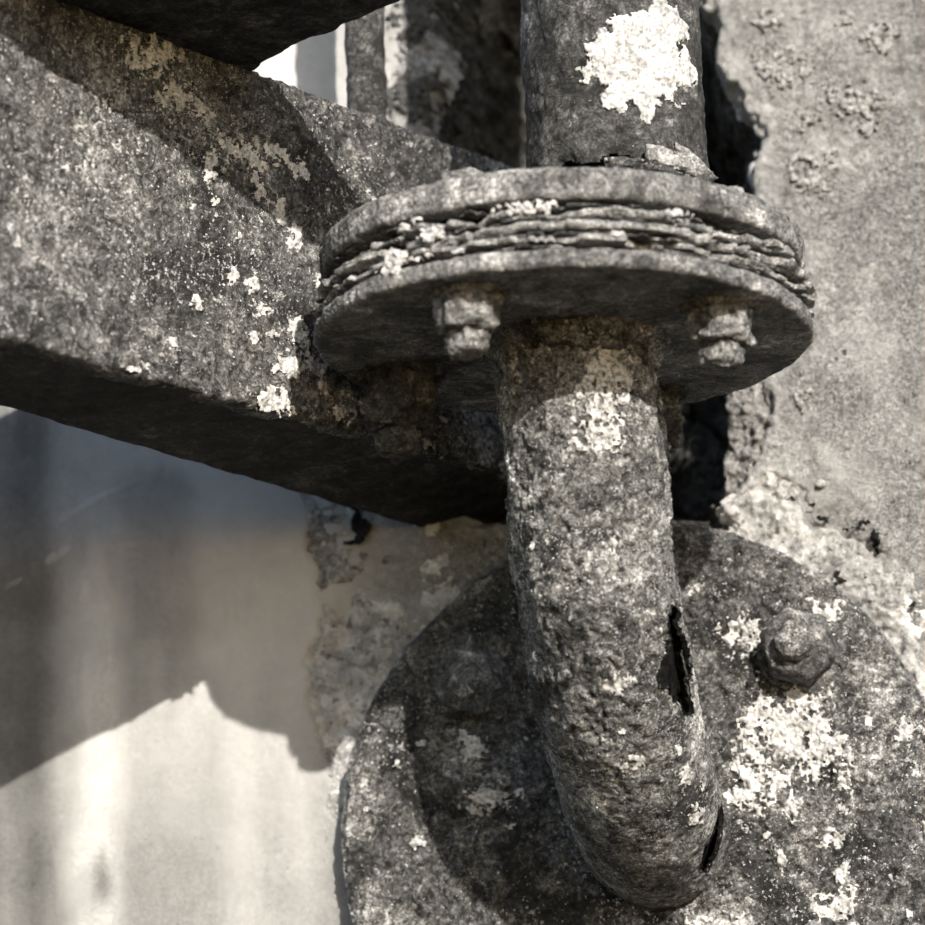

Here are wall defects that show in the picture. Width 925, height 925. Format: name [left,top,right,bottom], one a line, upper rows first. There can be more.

spalling [385,0,527,169]
rust [604,142,718,182]
spalling [699,0,765,195]
spalling [787,144,840,198]
spalling [747,6,902,138]
spalling [669,380,925,700]